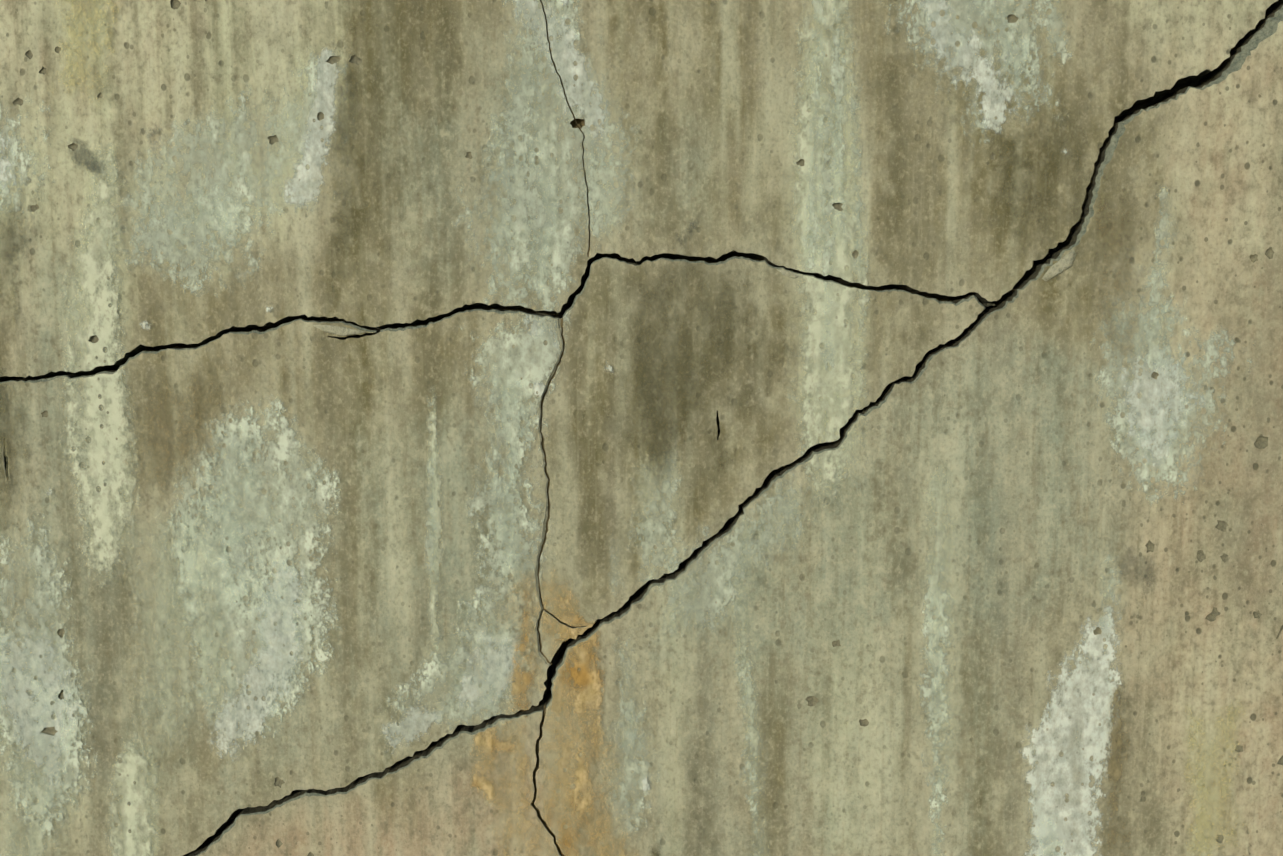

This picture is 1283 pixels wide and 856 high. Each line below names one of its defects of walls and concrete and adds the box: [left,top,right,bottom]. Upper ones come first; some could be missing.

crack [540,0,590,257]
leakage [887,0,1071,176]
crack [1145,6,1283,111]
crack [0,250,995,384]
leakage [154,400,340,755]
crack [532,318,586,666]
crack [743,387,894,511]
efflorescence [0,520,97,856]
efflorescence [110,742,158,856]
crack [196,715,523,856]
crack [531,706,565,856]
leakage [1022,570,1129,856]